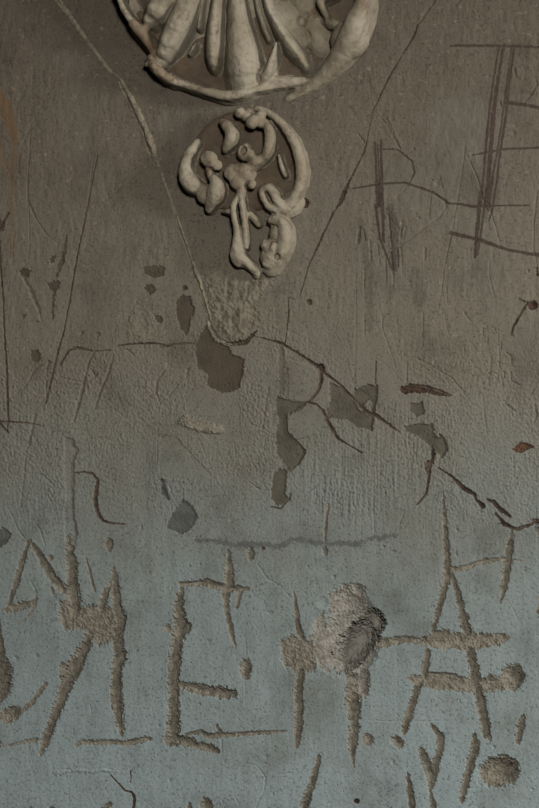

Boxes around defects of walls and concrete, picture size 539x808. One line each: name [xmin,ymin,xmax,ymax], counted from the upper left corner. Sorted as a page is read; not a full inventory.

flaking render [174,262,278,394]
peeling [270,341,307,511]
peeling [325,360,379,432]
peeling [403,400,448,459]
peeling [0,526,12,548]
peeling [159,478,199,535]
crack [416,445,535,532]
crack [109,770,136,808]